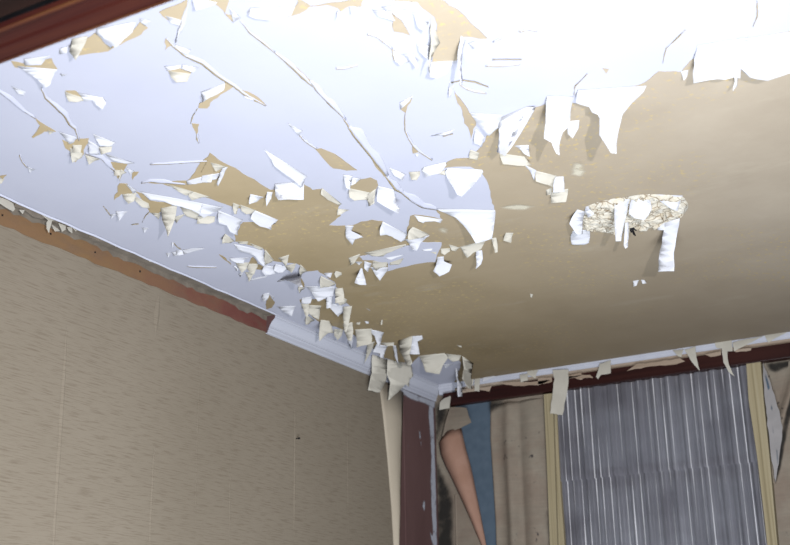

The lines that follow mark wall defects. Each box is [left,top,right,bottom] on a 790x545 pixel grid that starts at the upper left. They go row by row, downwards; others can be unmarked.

peeling [59,18,152,60]
peeling [159,0,363,43]
peeling [367,0,488,86]
peeling [0,56,138,180]
peeling [0,197,25,214]
peeling [43,215,72,233]
peeling [114,31,790,415]
peeling [368,336,423,545]
peeling [763,365,783,482]